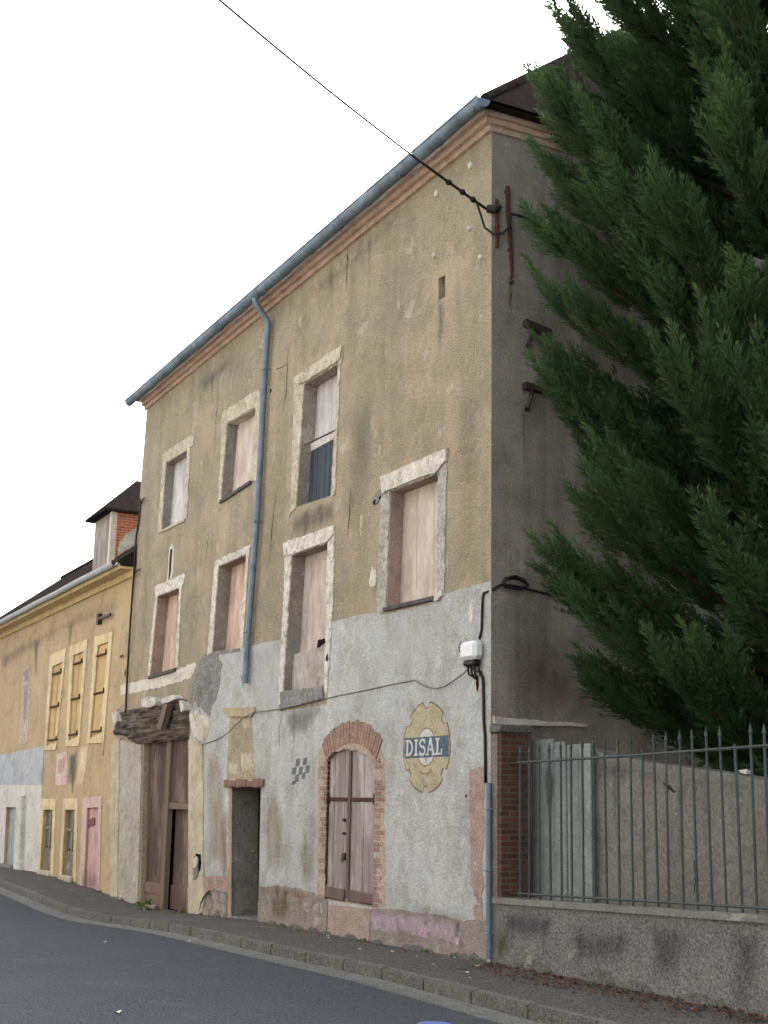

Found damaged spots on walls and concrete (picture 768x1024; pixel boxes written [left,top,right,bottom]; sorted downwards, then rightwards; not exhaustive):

flaking render [120,649,222,742]
peeling [465,766,485,921]